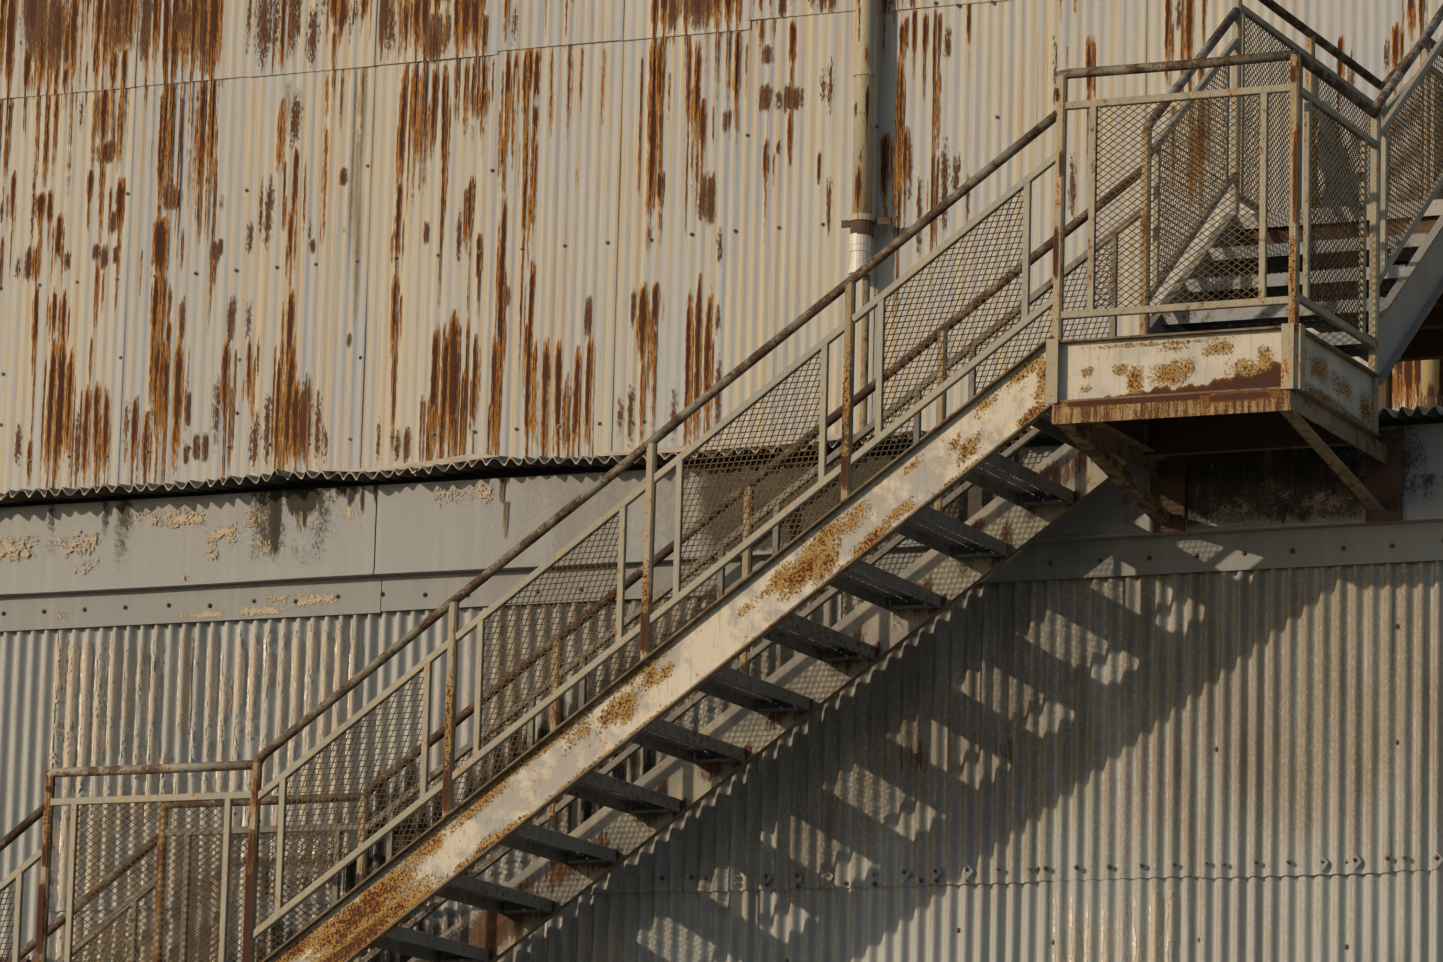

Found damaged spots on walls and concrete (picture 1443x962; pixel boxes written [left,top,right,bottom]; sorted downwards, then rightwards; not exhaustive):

corrosion [0,0,596,490]
corrosion [637,0,836,262]
corrosion [854,0,971,337]
corrosion [1383,0,1426,96]
corrosion [615,272,721,447]
corrosion [1392,360,1421,411]
water stain [102,500,132,554]
water stain [251,485,378,563]
corrosion [736,336,1372,618]
water stain [1185,445,1366,527]
corrosion [271,559,676,962]
corrosion [242,828,254,962]